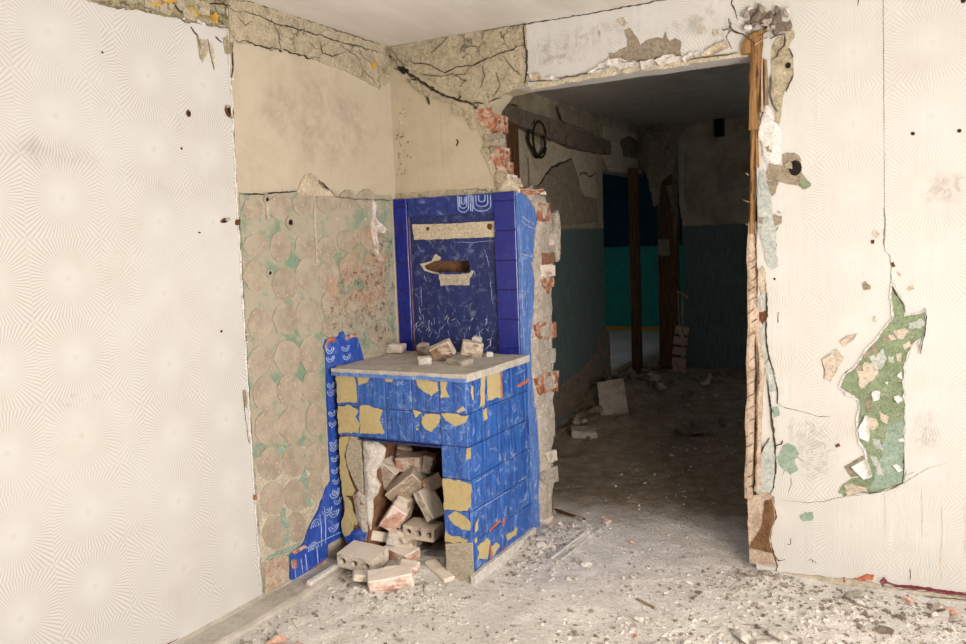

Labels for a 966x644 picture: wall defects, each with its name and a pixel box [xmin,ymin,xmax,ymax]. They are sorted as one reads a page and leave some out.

crack [227,0,664,147]
peeling [527,3,795,132]
flaking render [602,127,641,173]
crack [883,160,892,283]
peeling [87,0,496,594]
flaking render [533,321,611,422]
peeling [744,146,811,495]
peeling [822,262,927,497]
spalling [539,449,559,485]